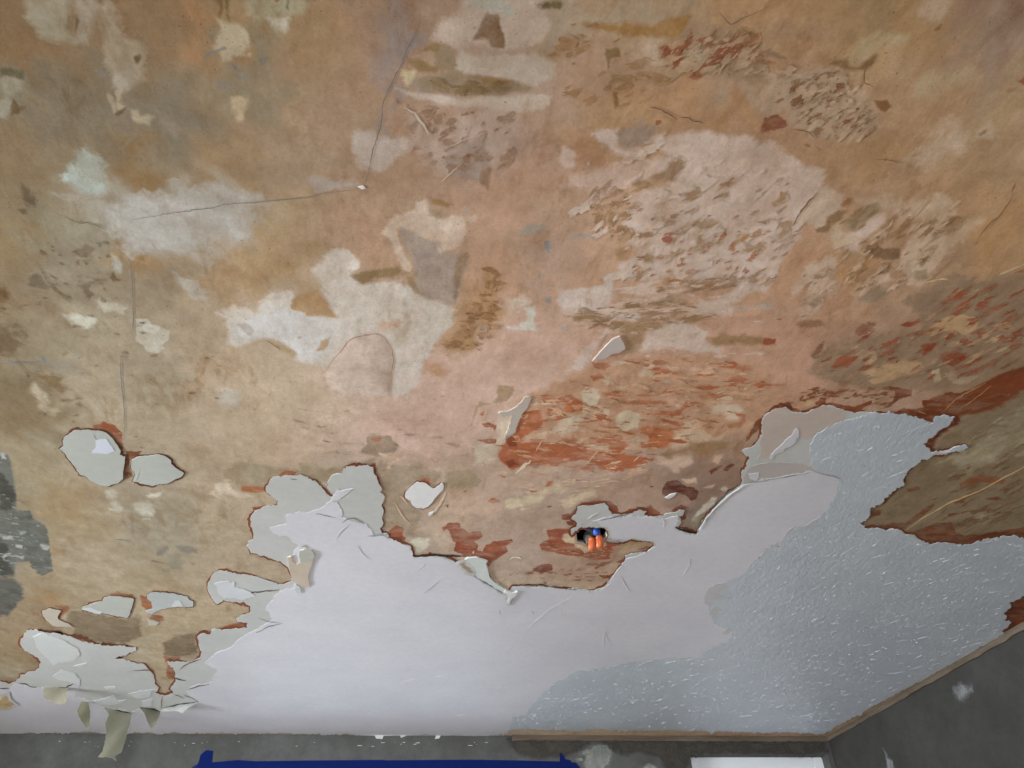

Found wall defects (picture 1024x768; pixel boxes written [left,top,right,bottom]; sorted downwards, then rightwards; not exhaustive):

crack [131,21,421,220]
peeling [0,258,1024,736]